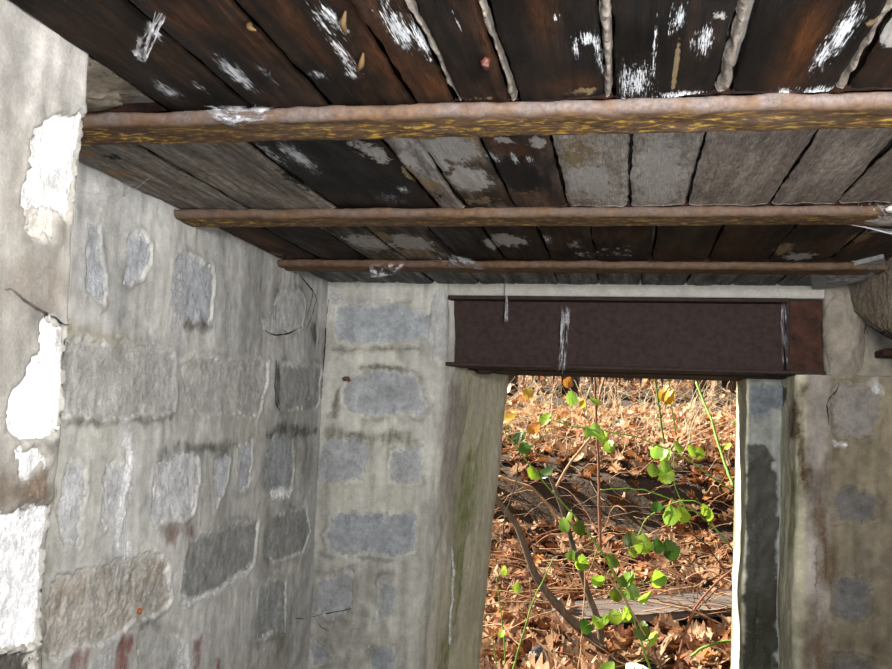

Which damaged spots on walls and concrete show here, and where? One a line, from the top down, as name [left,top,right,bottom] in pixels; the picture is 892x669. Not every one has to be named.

spalling [20,112,82,244]
crack [5,288,69,325]
crack [864,323,892,340]